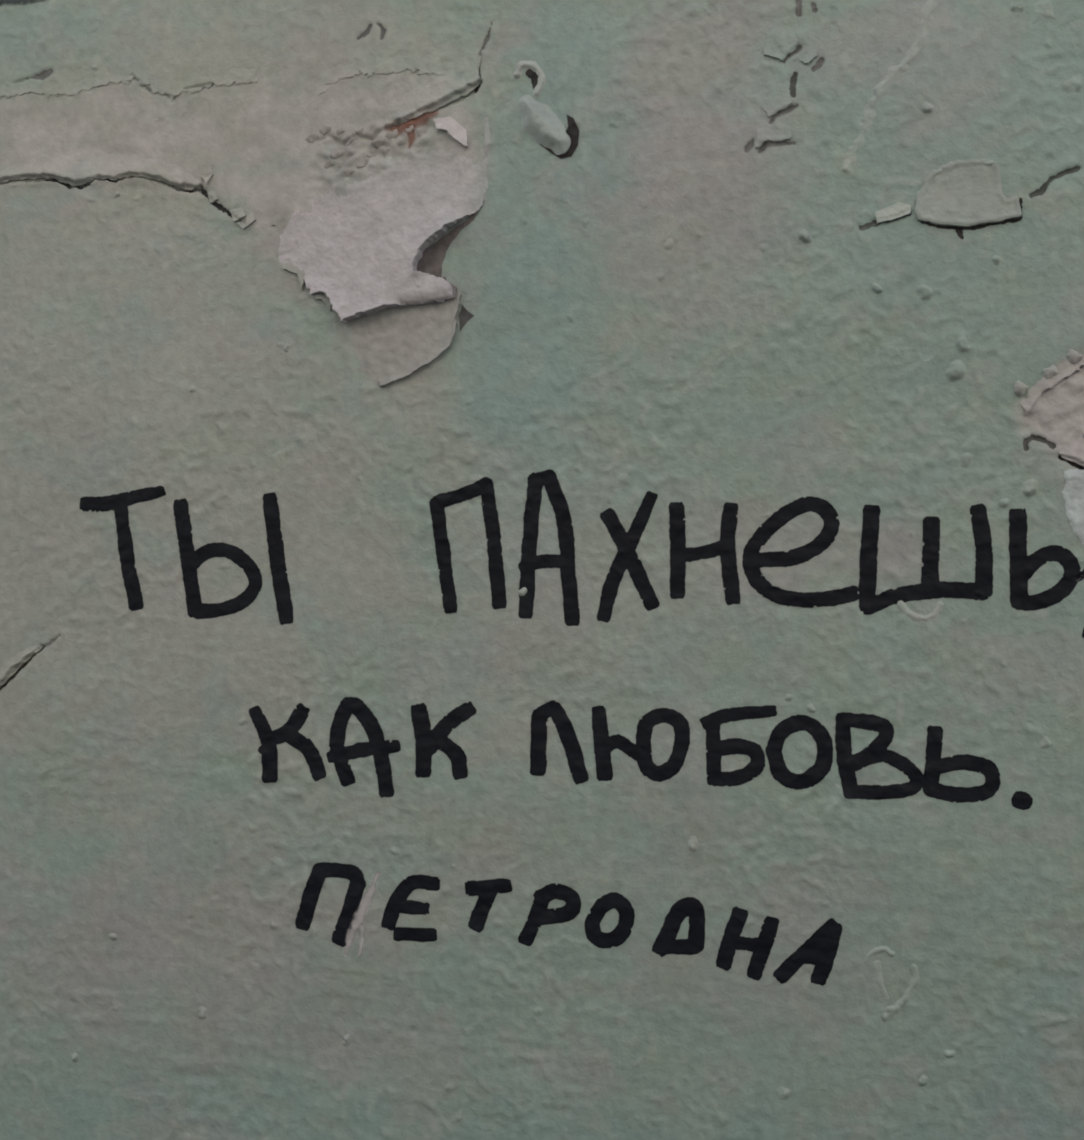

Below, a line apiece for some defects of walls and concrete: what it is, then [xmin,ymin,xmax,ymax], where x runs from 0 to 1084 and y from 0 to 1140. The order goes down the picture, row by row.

crack [0,149,256,230]
peeling [0,51,492,387]
spalling [1013,349,1084,416]
spalling [1062,469,1084,545]